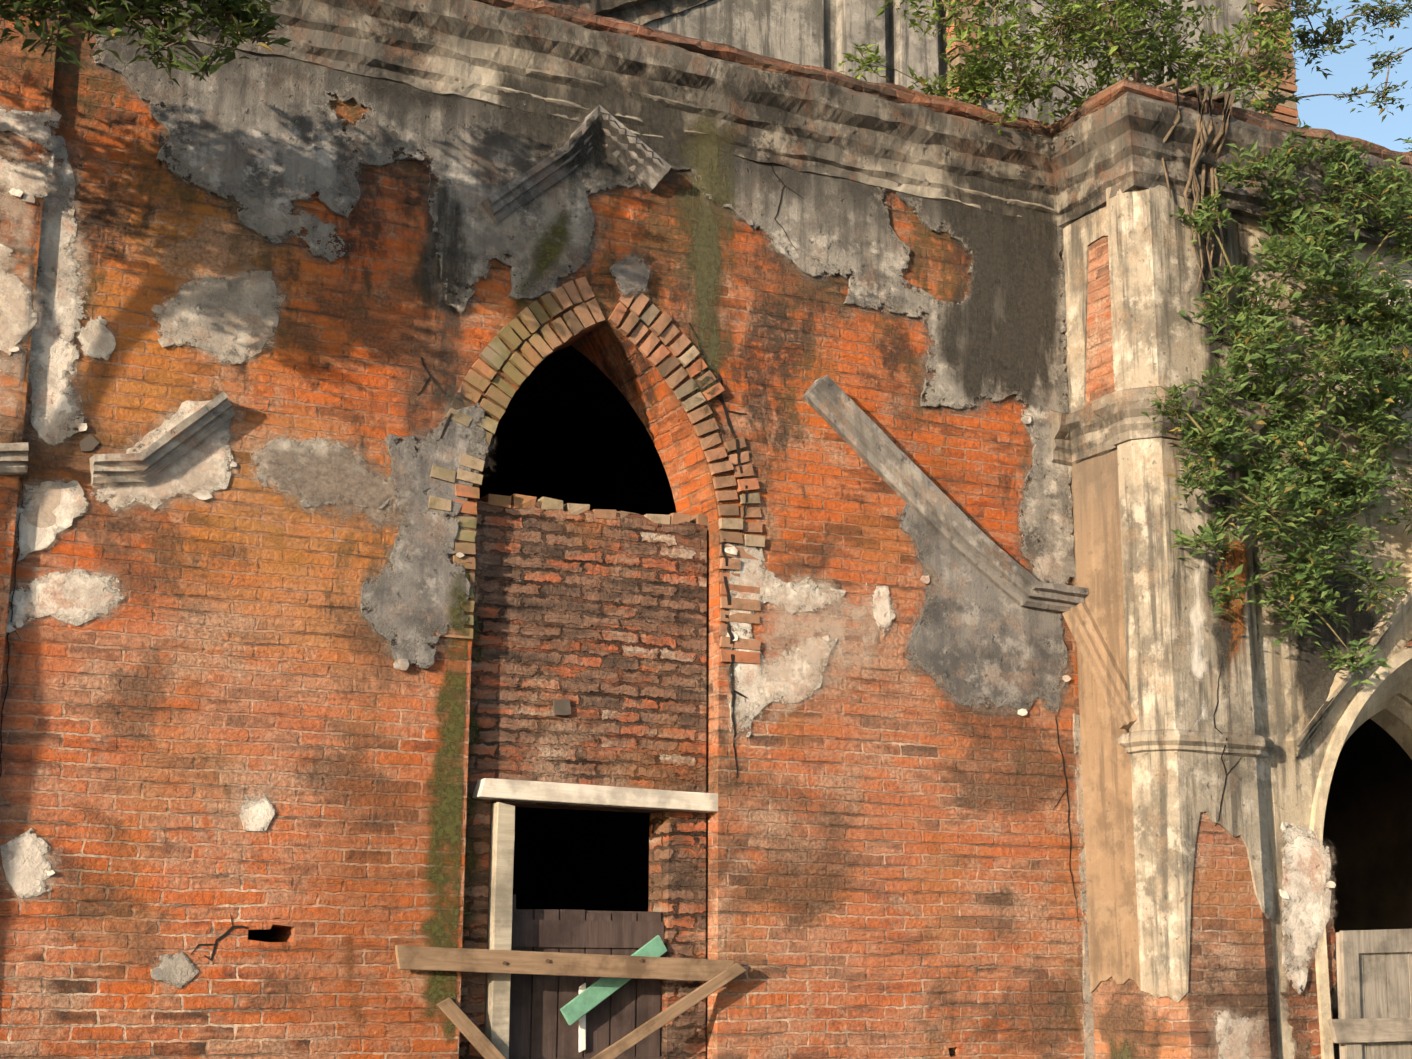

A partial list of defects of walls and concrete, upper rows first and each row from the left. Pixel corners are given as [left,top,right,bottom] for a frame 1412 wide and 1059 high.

crack [0,463,27,777]
flaking render [0,107,116,452]
flaking render [6,569,126,633]
flaking render [126,400,211,454]
flaking render [15,419,390,561]
flaking render [151,270,285,365]
flaking render [93,24,650,314]
damp [419,181,471,410]
damp [480,67,735,411]
flaking render [666,141,1076,585]
damp [802,375,1412,760]
flaking render [1279,822,1337,1059]